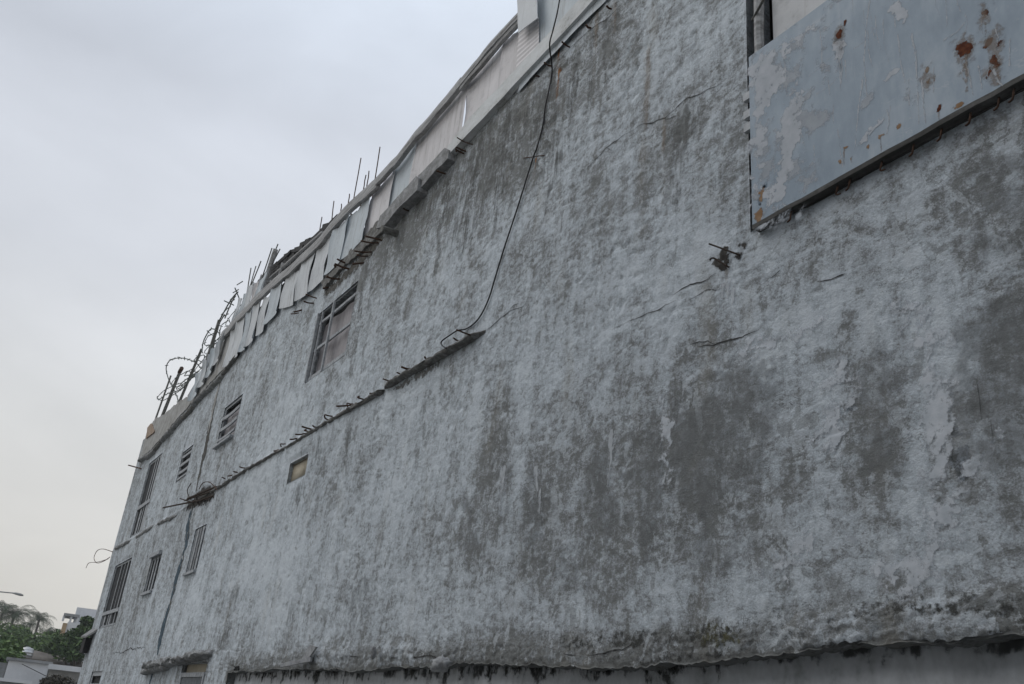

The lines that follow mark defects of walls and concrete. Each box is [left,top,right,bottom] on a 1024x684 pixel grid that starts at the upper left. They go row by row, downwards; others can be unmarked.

corrosion [955,37,1003,79]
crack [588,85,718,167]
peeling [746,24,815,229]
spalling [324,237,384,296]
crack [612,273,716,330]
crack [692,329,759,347]
damp [237,670,364,684]
damp [384,665,556,684]
damp [560,622,741,684]
damp [854,592,981,617]
damp [976,599,1024,656]